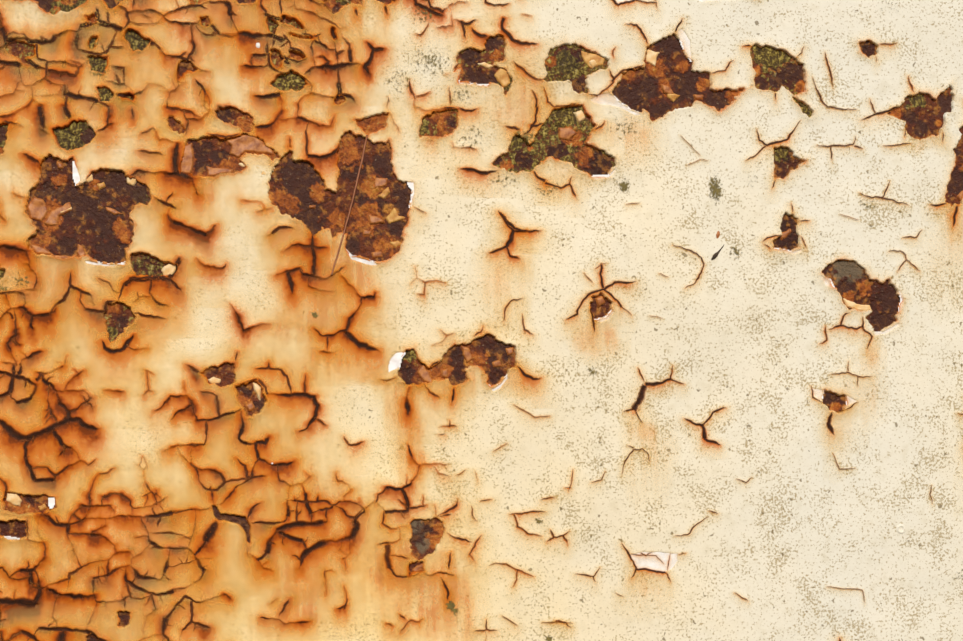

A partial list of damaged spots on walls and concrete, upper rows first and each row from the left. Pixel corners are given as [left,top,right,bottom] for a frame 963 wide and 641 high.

crack [383,0,530,42]
crack [0,0,451,281]
corrosion [419,106,479,143]
corrosion [0,103,414,370]
crack [490,212,541,263]
crack [0,205,465,641]
corrosion [383,328,542,476]
crack [625,367,683,422]
corrosion [0,471,153,598]
corrosion [170,360,352,641]
corrosion [370,502,481,630]
peeling [622,544,684,581]